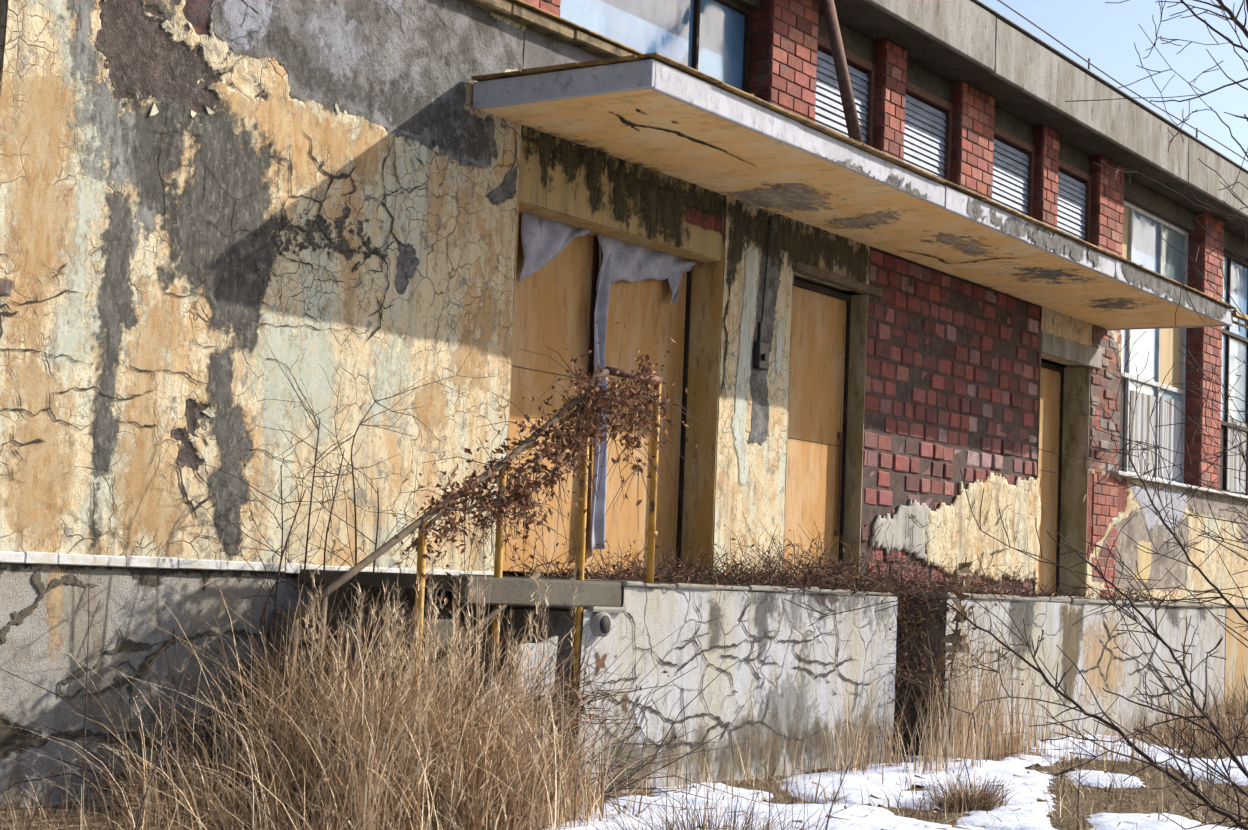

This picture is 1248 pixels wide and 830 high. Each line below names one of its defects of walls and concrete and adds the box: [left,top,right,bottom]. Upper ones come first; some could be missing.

water stain [0,0,411,591]
crack [152,96,429,340]
flaking render [95,0,525,205]
water stain [223,0,491,175]
crack [609,110,753,165]
water stain [521,126,871,486]
crack [0,258,231,549]
flaking render [172,398,215,471]
flaking render [870,472,1041,584]
flaking render [1083,469,1248,592]
crack [594,592,881,759]
water stain [1060,605,1084,705]